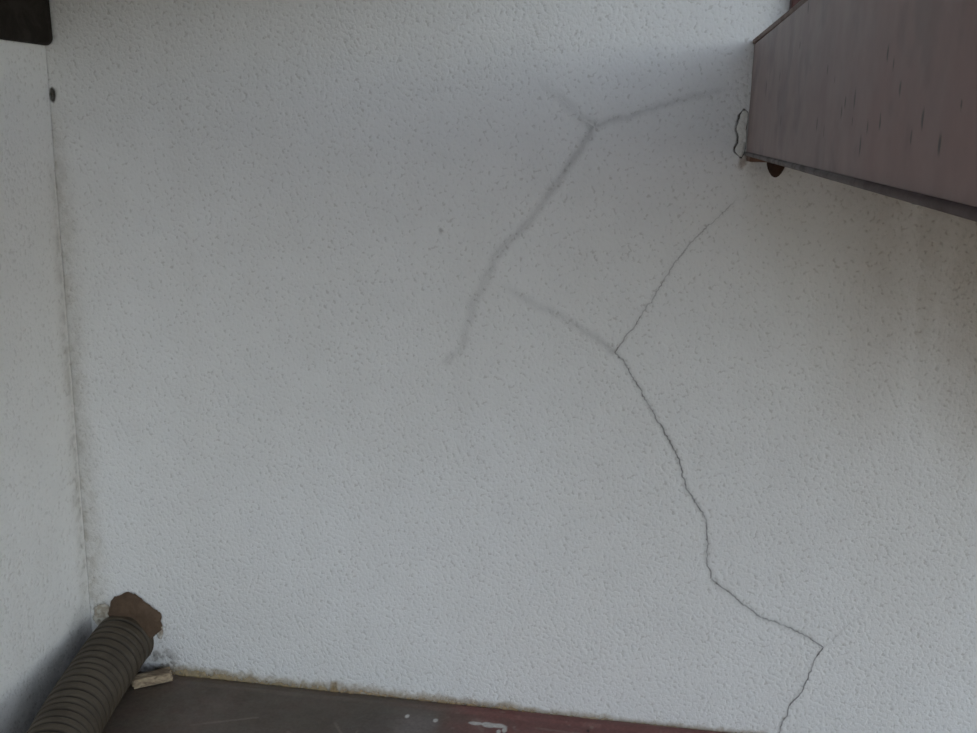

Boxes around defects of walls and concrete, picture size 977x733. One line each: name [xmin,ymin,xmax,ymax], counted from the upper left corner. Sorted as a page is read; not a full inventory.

crack [619,357,742,604]
crack [780,627,823,731]